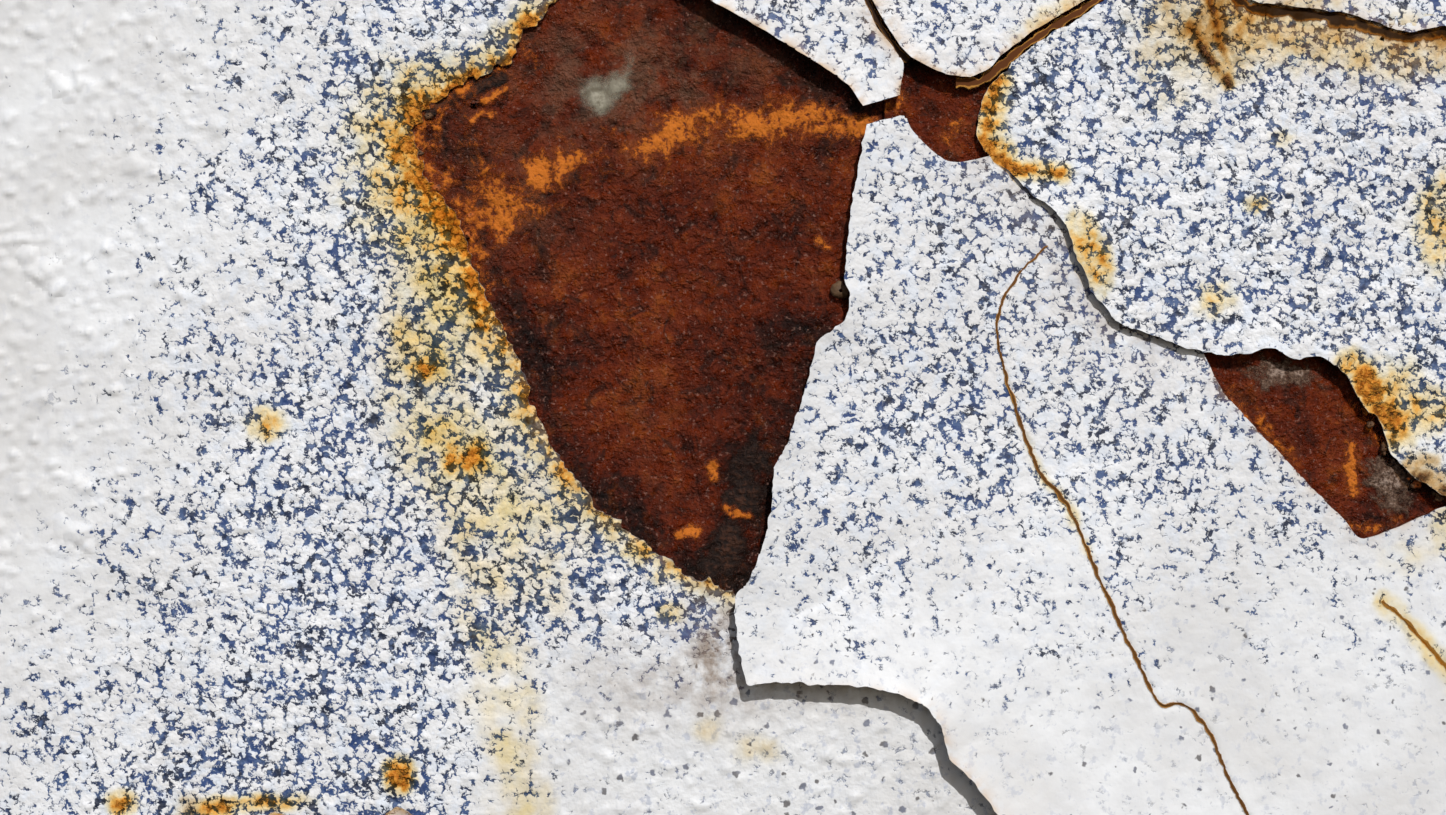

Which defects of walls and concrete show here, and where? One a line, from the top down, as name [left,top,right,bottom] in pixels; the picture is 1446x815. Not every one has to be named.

crack [865,0,910,63]
crack [956,0,1100,89]
corrosion [1197,0,1233,87]
crack [1232,0,1446,43]
corrosion [392,71,488,308]
peeling [408,0,1446,815]
corrosion [1356,367,1401,430]
crack [995,246,1249,815]
crack [1381,600,1446,669]
corrosion [389,765,408,788]
peeling [386,807,412,815]